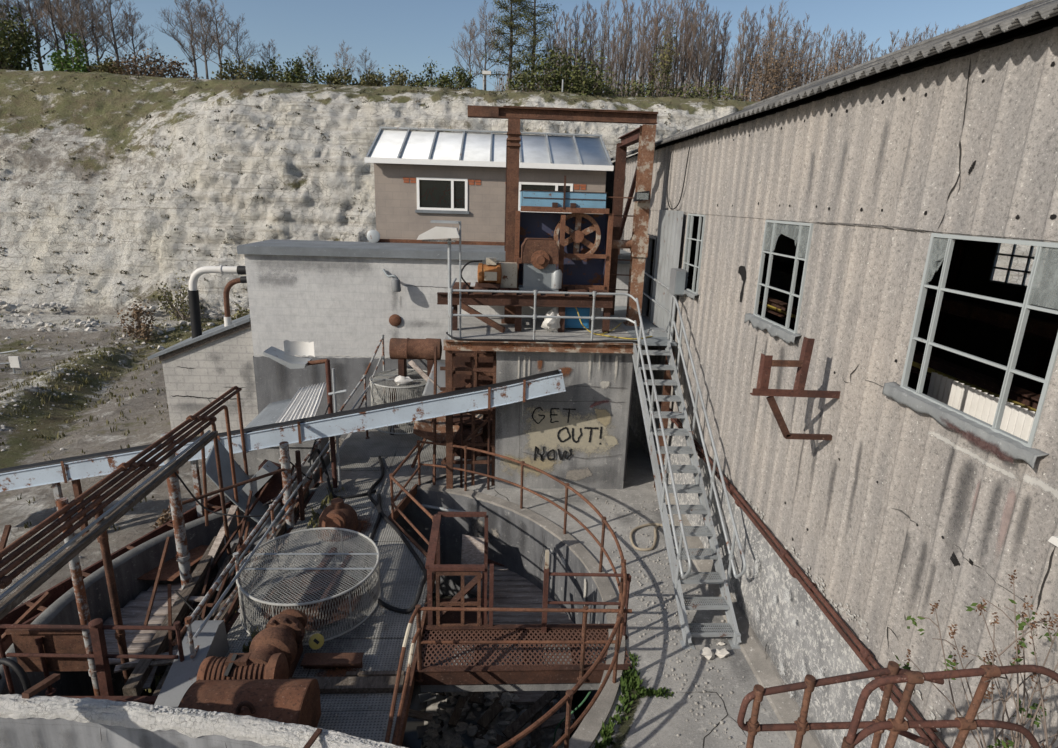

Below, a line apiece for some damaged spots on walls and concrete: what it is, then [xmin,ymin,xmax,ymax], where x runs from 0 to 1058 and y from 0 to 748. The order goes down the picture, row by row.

crack [816,58,971,232]
peeling [524,407,618,481]
damp [945,420,1013,463]
crack [953,544,1056,612]